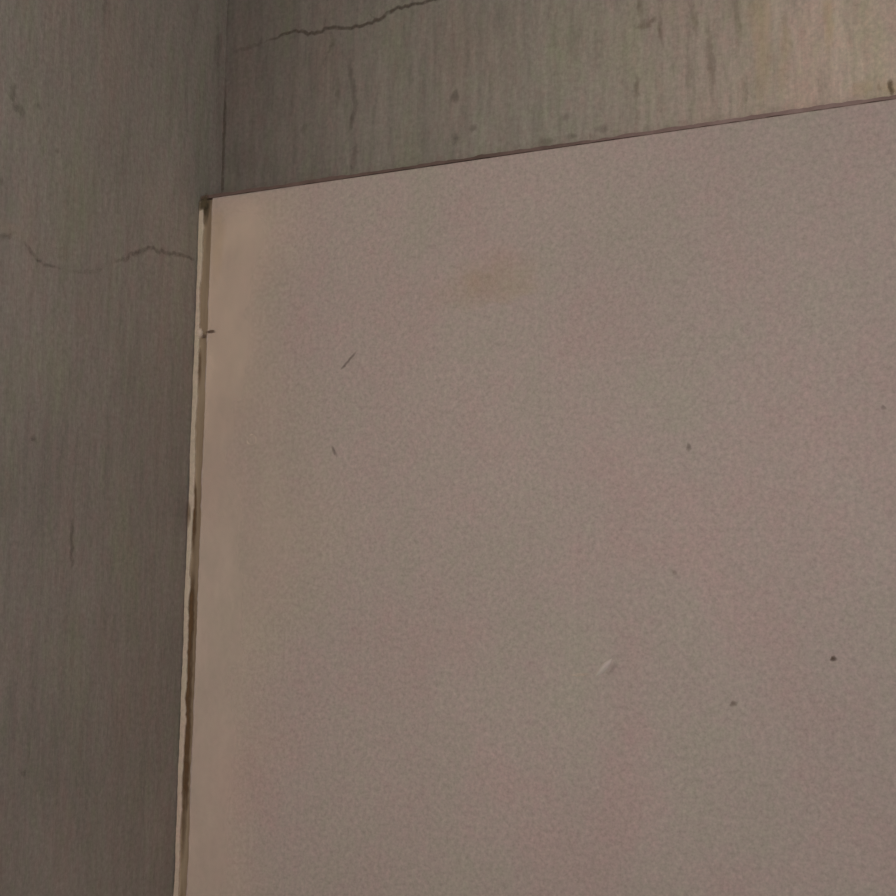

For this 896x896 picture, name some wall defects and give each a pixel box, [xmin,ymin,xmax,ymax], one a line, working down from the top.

crack [281,0,431,35]